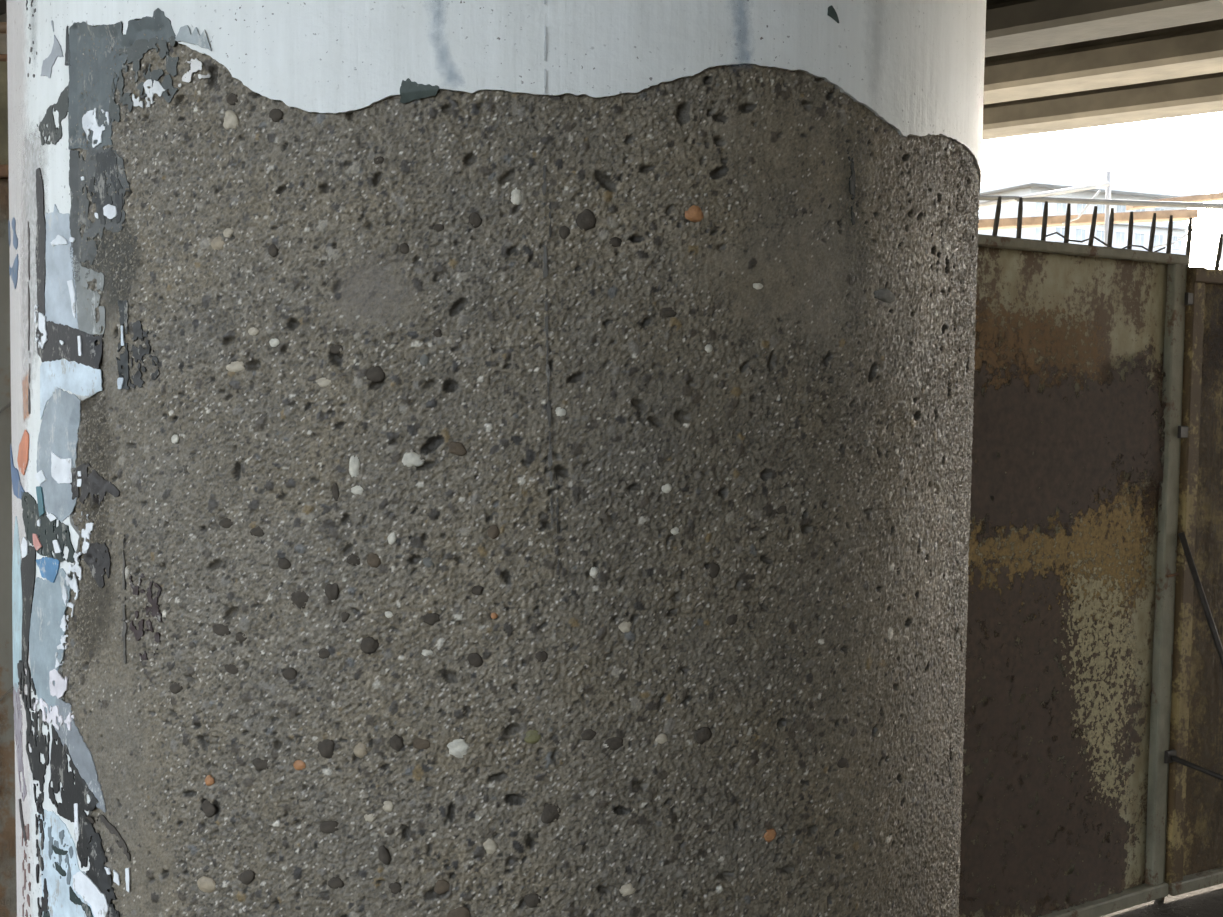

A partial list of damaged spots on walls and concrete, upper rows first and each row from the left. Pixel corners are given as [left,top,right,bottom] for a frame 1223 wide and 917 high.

peeling [37,8,212,167]
corrosion [0,181,9,215]
peeling [34,304,64,349]
peeling [51,451,72,484]
spalling [61,41,980,917]
corrosion [968,285,1166,631]
peeling [13,660,39,801]
peeling [40,698,75,731]
peeling [49,652,68,699]
peeling [958,552,1147,917]
peeling [22,824,31,917]
peeling [33,784,109,917]